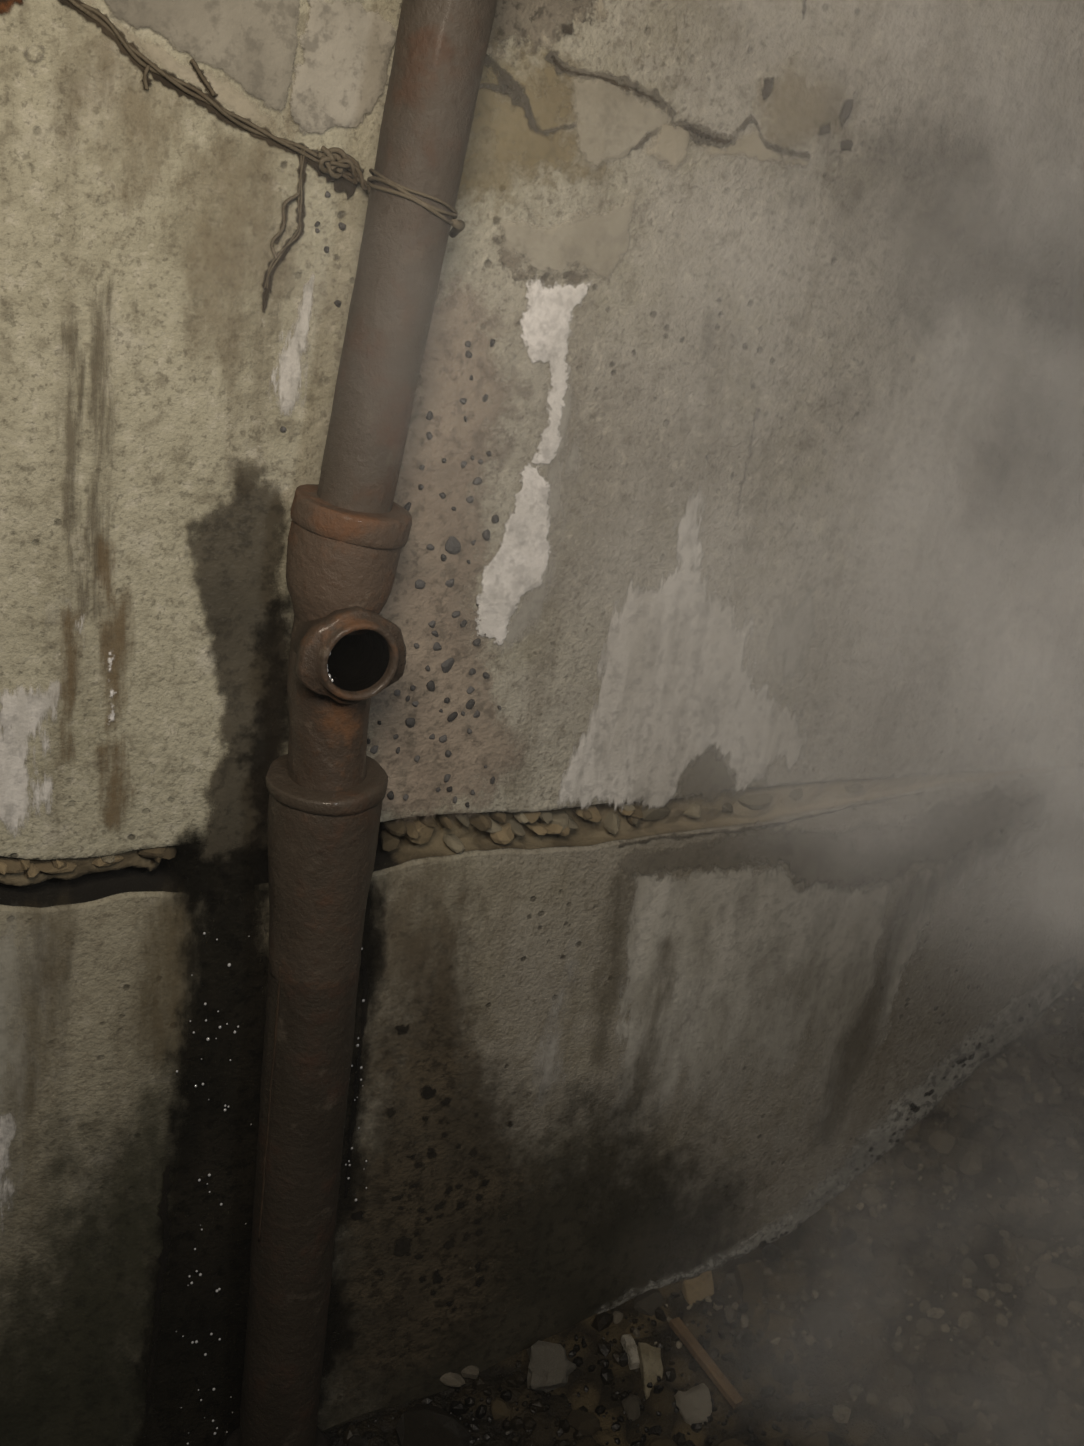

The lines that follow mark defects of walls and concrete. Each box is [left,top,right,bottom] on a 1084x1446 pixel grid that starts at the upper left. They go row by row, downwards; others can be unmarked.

crack [479,54,577,135]
crack [545,50,810,159]
leakage [62,315,105,563]
spalling [367,236,591,815]
corrosion [63,611,76,709]
corrosion [98,539,126,702]
peeling [557,488,812,809]
leakage [678,746,735,802]
crack [619,792,924,847]
leakage [0,467,291,1446]
leakage [317,787,1049,1433]